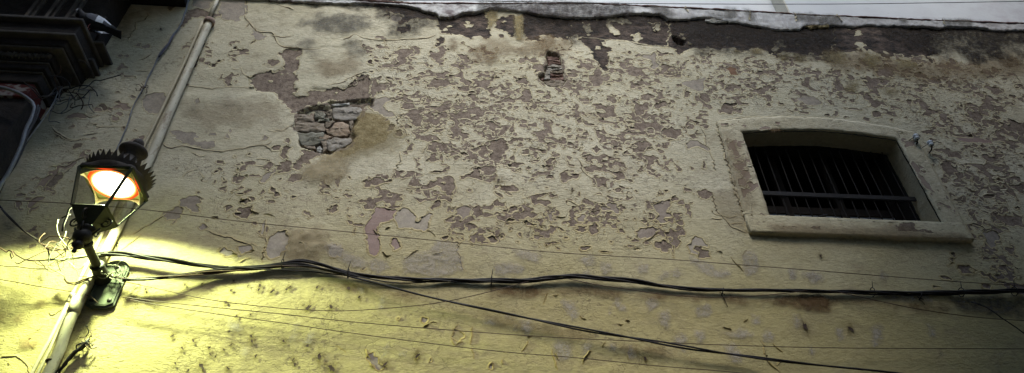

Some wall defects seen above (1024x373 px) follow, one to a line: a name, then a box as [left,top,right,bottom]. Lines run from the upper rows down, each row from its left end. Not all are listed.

water stain [479,0,841,62]
water stain [882,18,1024,67]
peeling [161,0,1024,296]